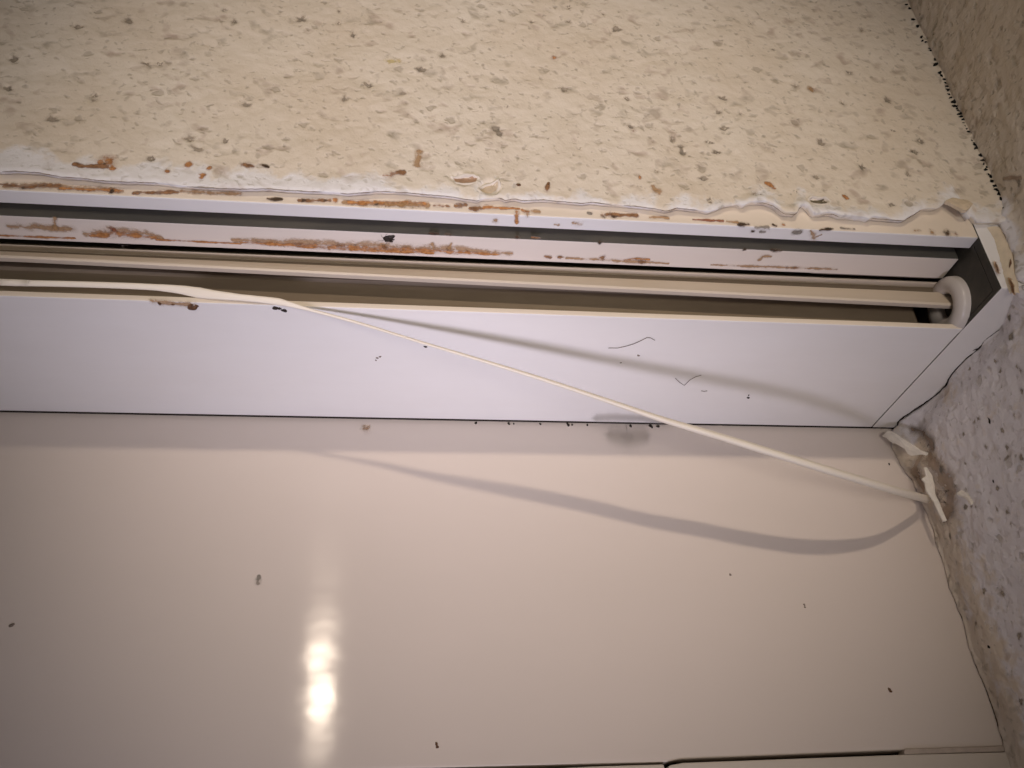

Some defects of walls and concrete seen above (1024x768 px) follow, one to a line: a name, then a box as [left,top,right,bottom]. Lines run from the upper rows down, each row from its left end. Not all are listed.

flaking render [451,173,501,195]
flaking render [796,191,831,205]
rust [297,198,541,224]
rust [0,217,513,256]
rust [544,255,669,264]
rust [712,255,837,270]